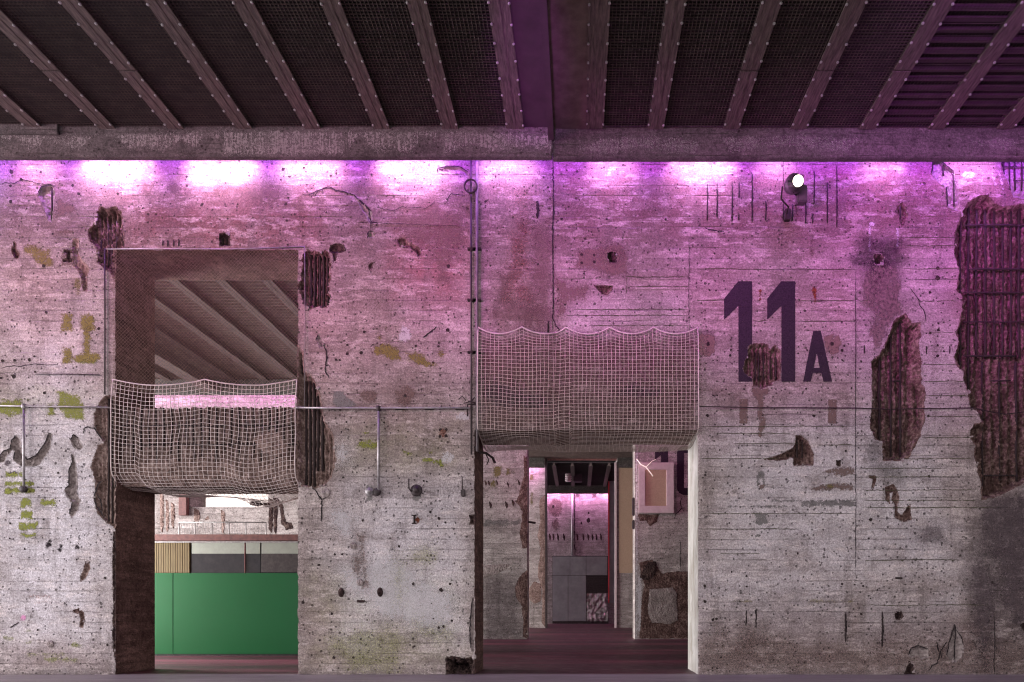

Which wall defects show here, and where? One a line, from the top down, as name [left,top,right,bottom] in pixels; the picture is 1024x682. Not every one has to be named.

spalling [62,206,125,292]
spalling [296,345,337,490]
spalling [297,243,346,311]
crack [303,186,465,228]
spalling [743,343,781,389]
spalling [764,435,814,467]
leakage [856,222,903,350]
spalling [864,313,928,462]
spalling [931,162,1024,500]
spalling [64,395,117,660]